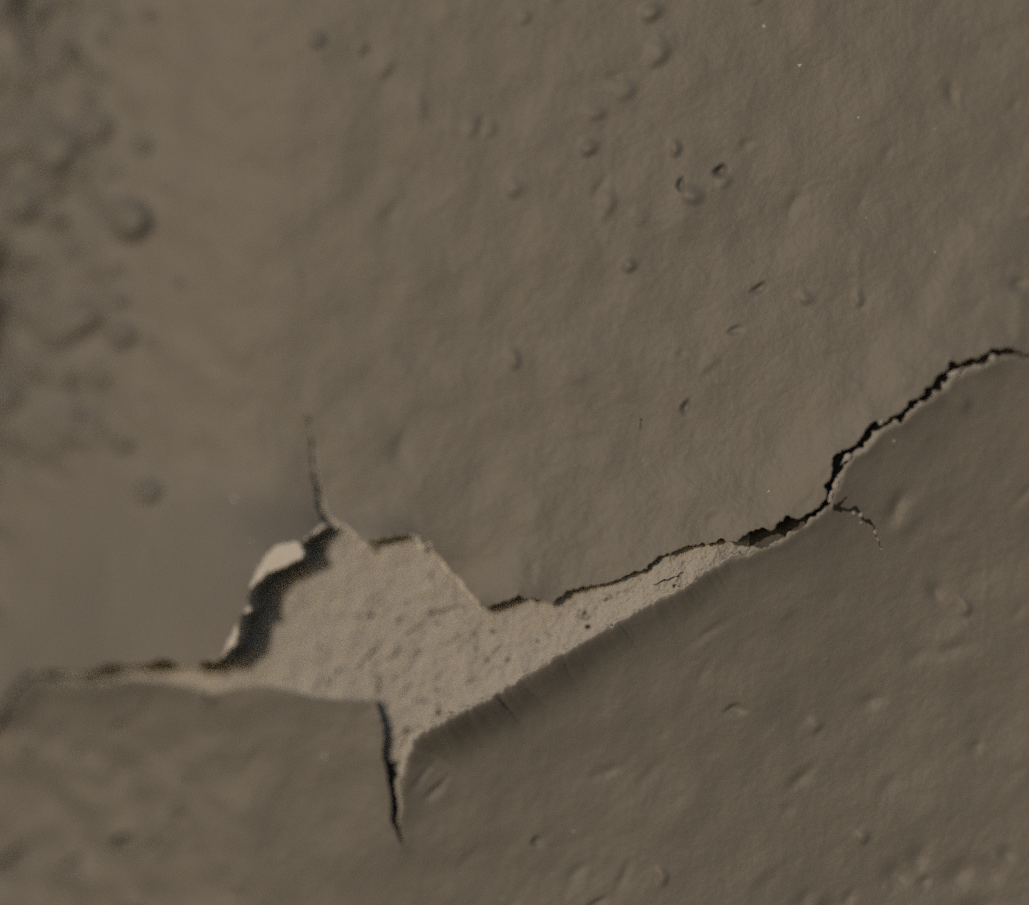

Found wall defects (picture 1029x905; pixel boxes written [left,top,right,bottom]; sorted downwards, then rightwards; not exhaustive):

crack [749,347,1029,548]
crack [0,660,218,727]
crack [357,604,464,717]
flaking render [96,347,1029,850]